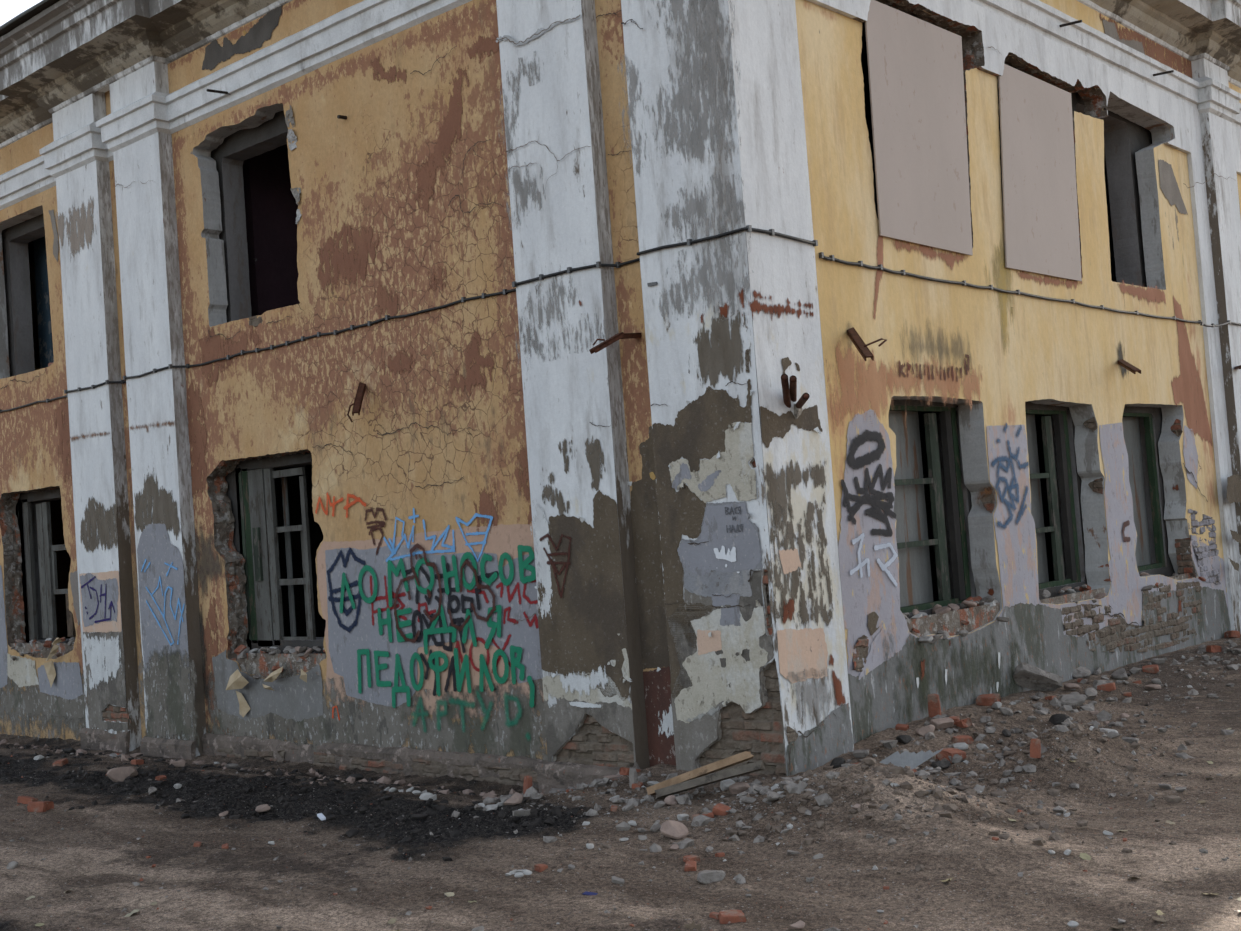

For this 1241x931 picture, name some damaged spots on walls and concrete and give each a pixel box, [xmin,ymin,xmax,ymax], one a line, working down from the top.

crack [496,10,643,46]
flaking render [285,105,297,150]
peeling [414,35,499,212]
peeling [498,59,544,230]
peeling [617,0,741,175]
rust [720,289,814,320]
peeling [186,316,263,497]
peeling [80,497,118,552]
peeling [133,469,181,540]
crack [377,422,479,505]
peeling [515,174,837,789]
spalling [852,612,879,672]